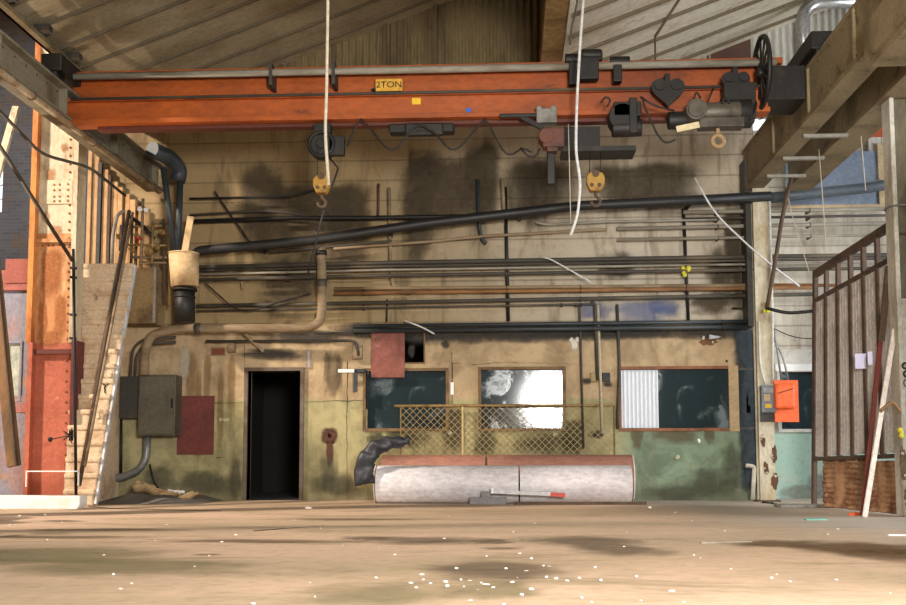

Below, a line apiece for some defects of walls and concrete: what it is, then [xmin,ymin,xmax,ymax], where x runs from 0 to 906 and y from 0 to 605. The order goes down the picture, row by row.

water stain [404,143,498,260]
water stain [509,162,571,219]
peeling [761,434,778,490]